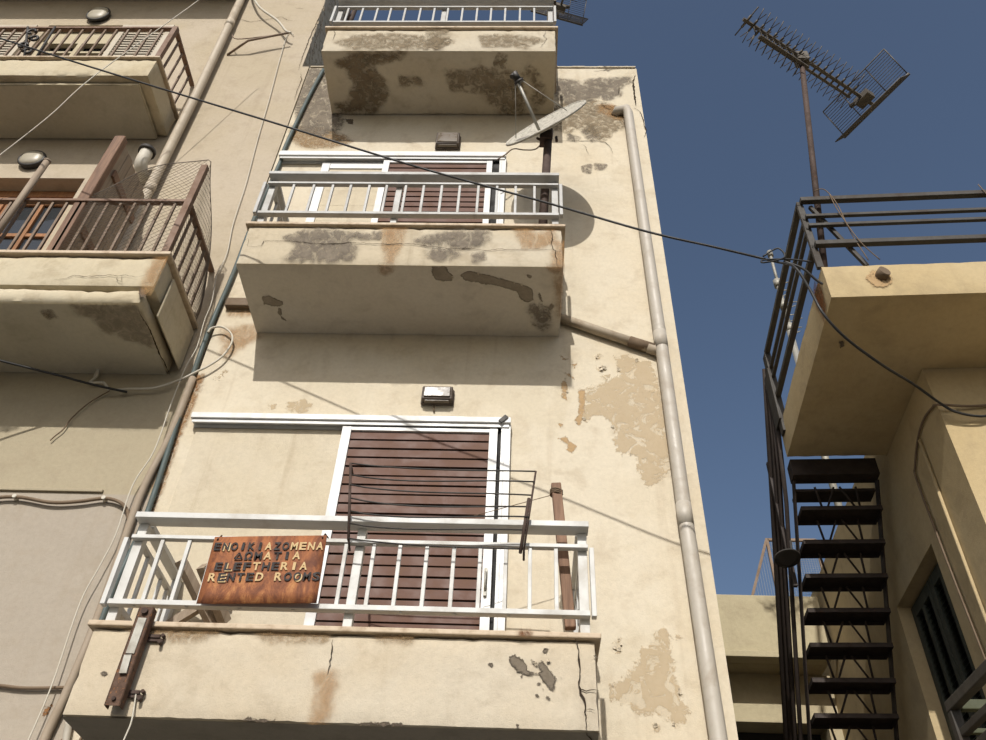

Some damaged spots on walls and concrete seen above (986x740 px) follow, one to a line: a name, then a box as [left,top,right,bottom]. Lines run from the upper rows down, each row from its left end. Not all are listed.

water stain [291,29,450,148]
water stain [446,34,544,115]
water stain [554,77,630,141]
water stain [284,228,381,262]
water stain [416,230,488,261]
flaking render [432,266,554,330]
flaking render [558,423,577,452]
flaking render [561,353,671,486]
flaking render [509,646,556,700]
crack [575,639,599,740]
flaking render [609,628,691,732]